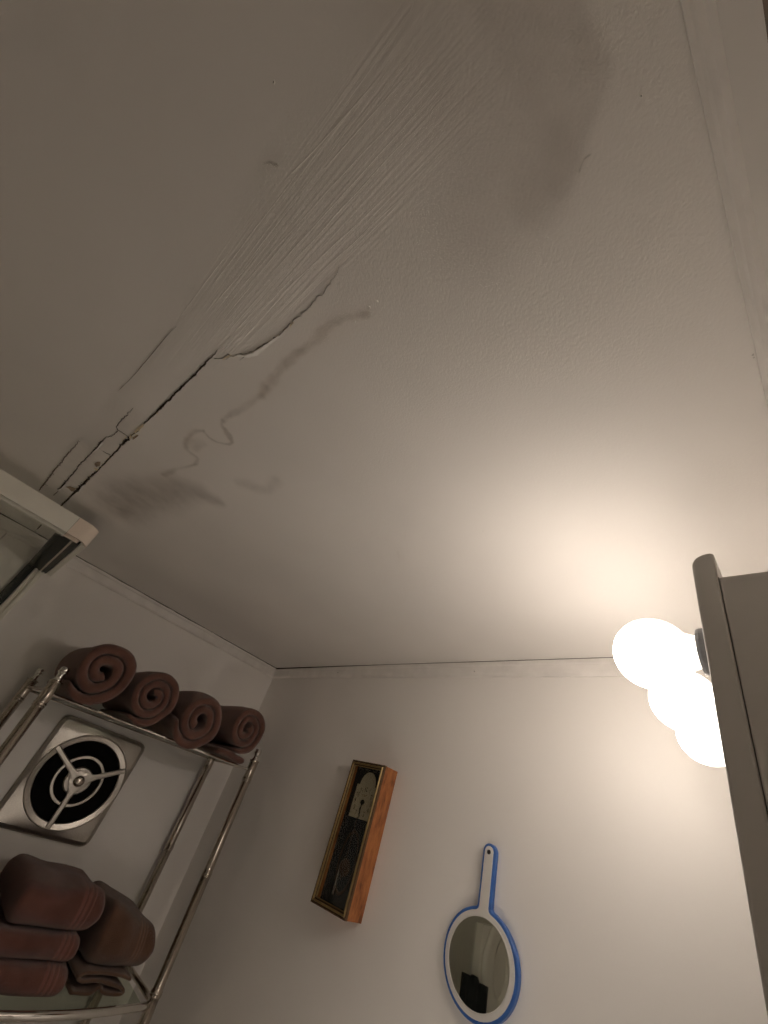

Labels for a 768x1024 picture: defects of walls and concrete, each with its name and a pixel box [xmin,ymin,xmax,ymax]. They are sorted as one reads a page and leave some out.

crack [60,267,360,507]